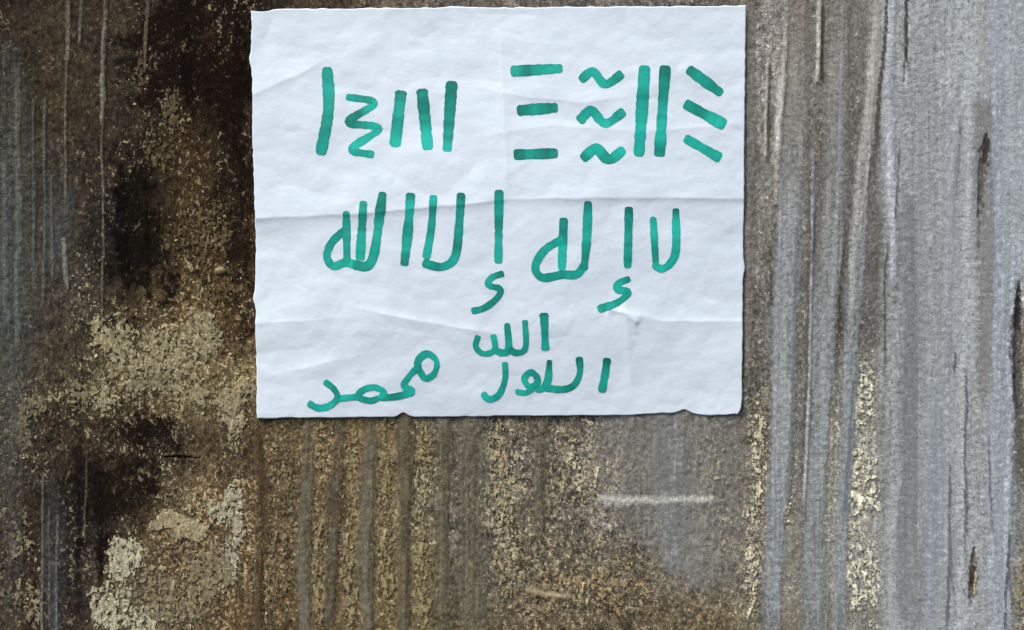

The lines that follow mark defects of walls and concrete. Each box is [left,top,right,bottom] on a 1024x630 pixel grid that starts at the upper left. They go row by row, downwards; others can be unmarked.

leakage [100,0,256,350]
leakage [745,0,1024,630]
leakage [40,416,183,630]
crack [945,352,1013,630]